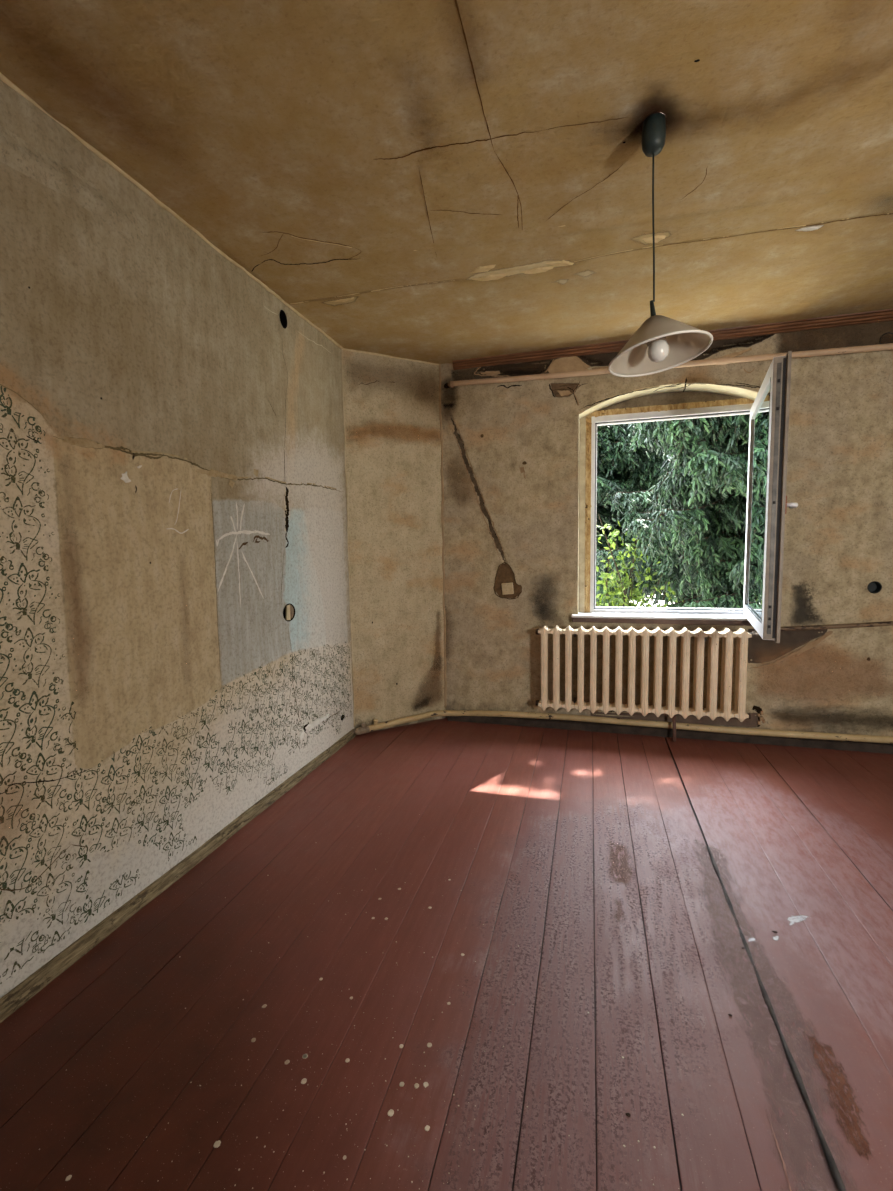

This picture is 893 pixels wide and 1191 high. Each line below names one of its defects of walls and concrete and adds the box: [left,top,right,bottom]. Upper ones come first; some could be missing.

crack [251,0,626,601]
crack [574,213,893,263]
peeling [0,384,337,594]
spalling [298,710,345,741]